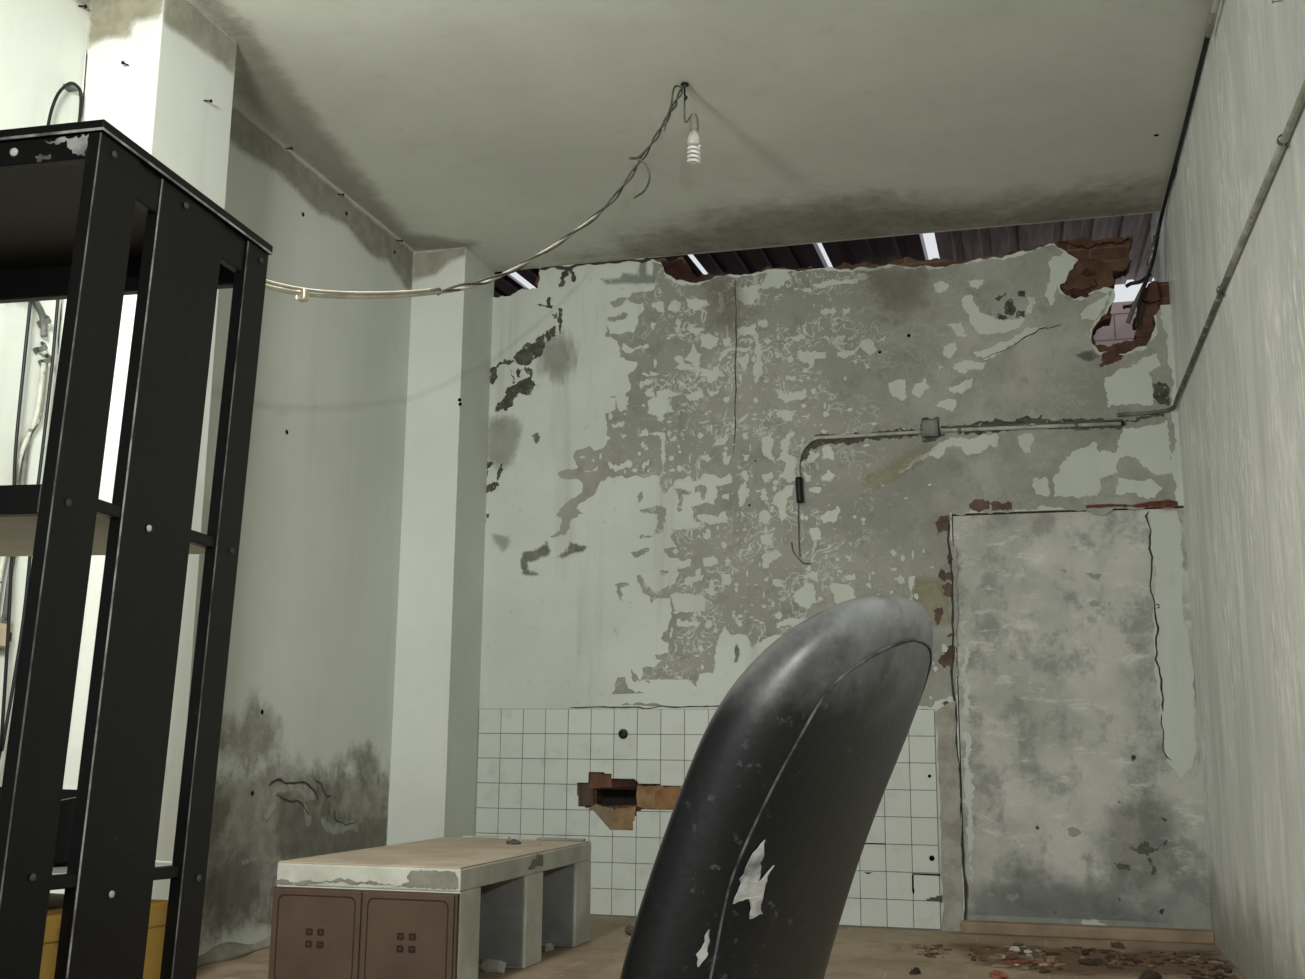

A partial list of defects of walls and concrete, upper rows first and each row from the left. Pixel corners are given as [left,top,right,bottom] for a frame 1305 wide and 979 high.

damp [78,0,236,69]
damp [230,108,465,290]
flaking render [490,269,576,412]
flaking render [486,461,503,493]
peeling [550,236,1177,890]
damp [202,706,389,938]